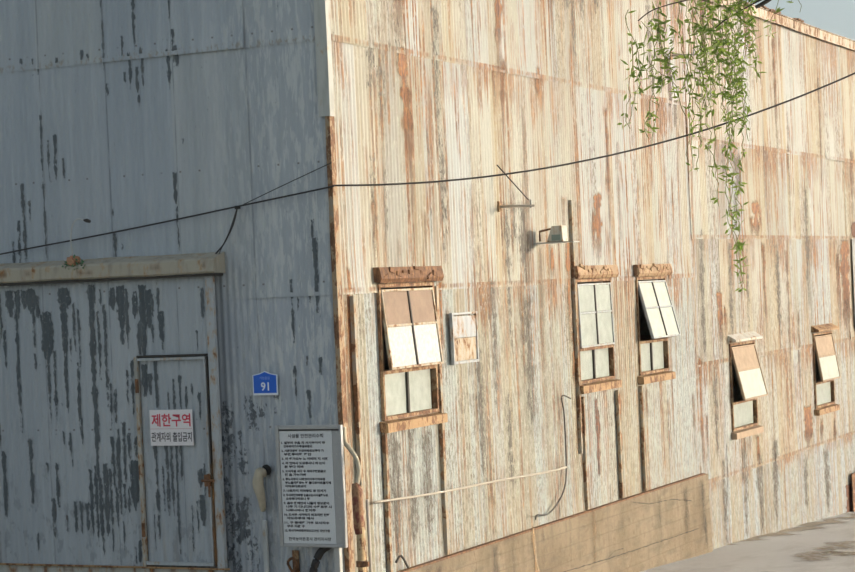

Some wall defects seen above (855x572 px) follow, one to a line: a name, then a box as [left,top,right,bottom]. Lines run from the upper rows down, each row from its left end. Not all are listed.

peeling [120,0,144,105]
rust [398,47,412,139]
peeling [12,183,31,263]
peeling [39,115,66,258]
rust [592,109,609,246]
rust [716,292,726,334]
rust [836,222,855,312]
peeling [0,284,201,563]
rust [692,358,708,440]
peeling [191,463,207,551]
peeling [222,395,279,572]
crack [564,528,699,572]